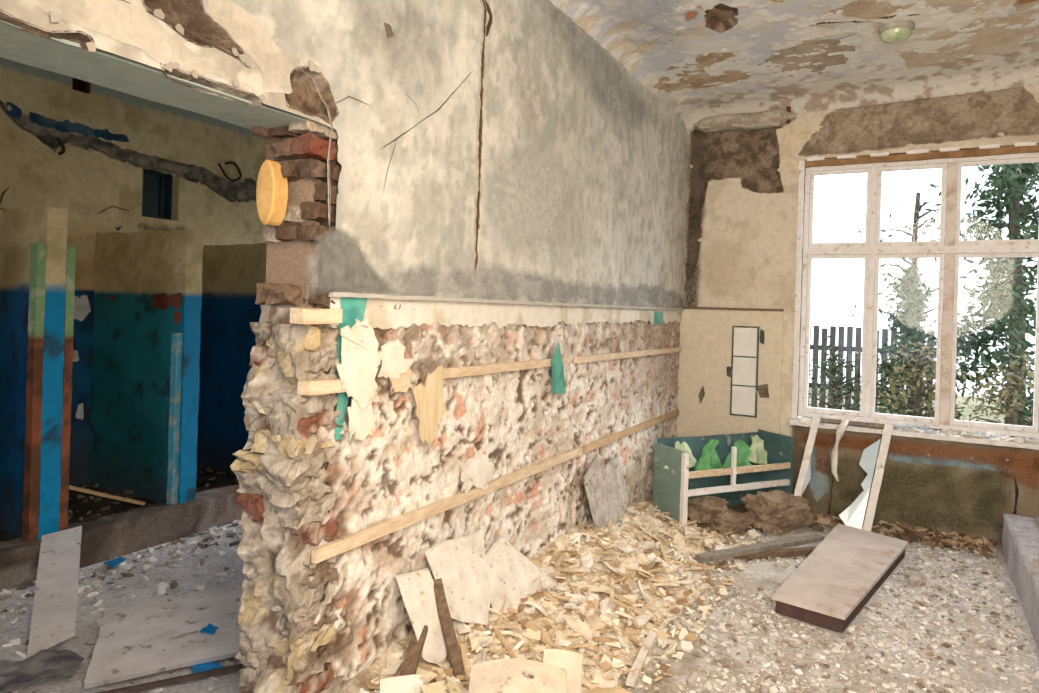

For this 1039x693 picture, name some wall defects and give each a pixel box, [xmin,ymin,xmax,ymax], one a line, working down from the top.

peeling [0,0,339,124]
crack [118,0,241,61]
peeling [653,48,751,93]
spalling [700,3,741,33]
peeling [764,39,855,79]
peeling [824,0,1039,69]
spalling [0,100,257,204]
crack [380,0,493,272]
spalling [685,87,1039,285]
peeling [335,297,414,444]
peeling [460,448,496,494]
rust [800,432,1039,488]